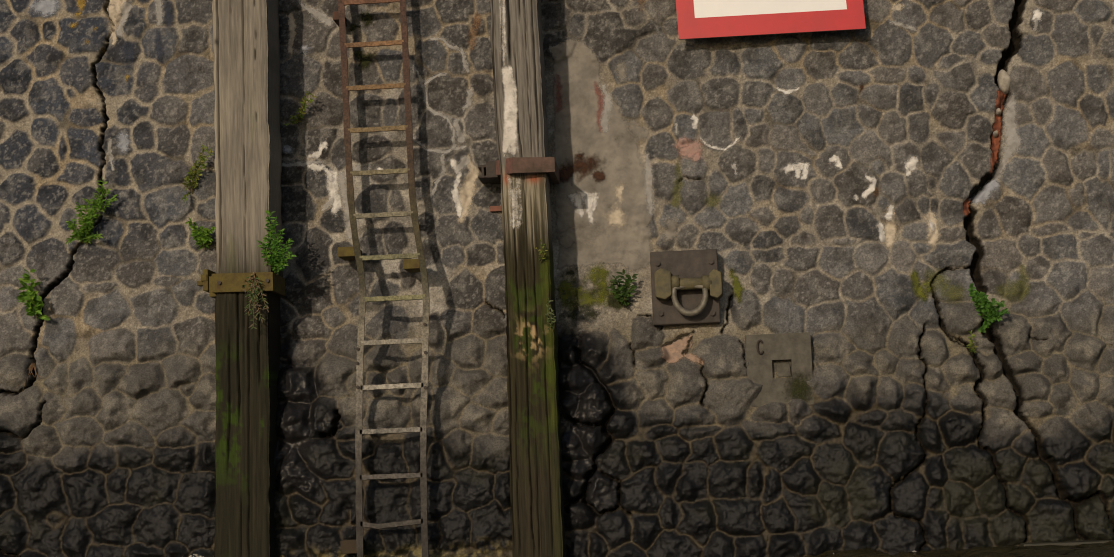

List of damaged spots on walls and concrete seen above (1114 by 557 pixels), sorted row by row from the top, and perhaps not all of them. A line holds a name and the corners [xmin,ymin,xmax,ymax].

corrosion [559,154,605,183]
crack [0,0,115,439]
crack [889,0,1114,551]
spalling [661,330,704,365]
crack [721,296,747,368]
crack [700,365,709,406]